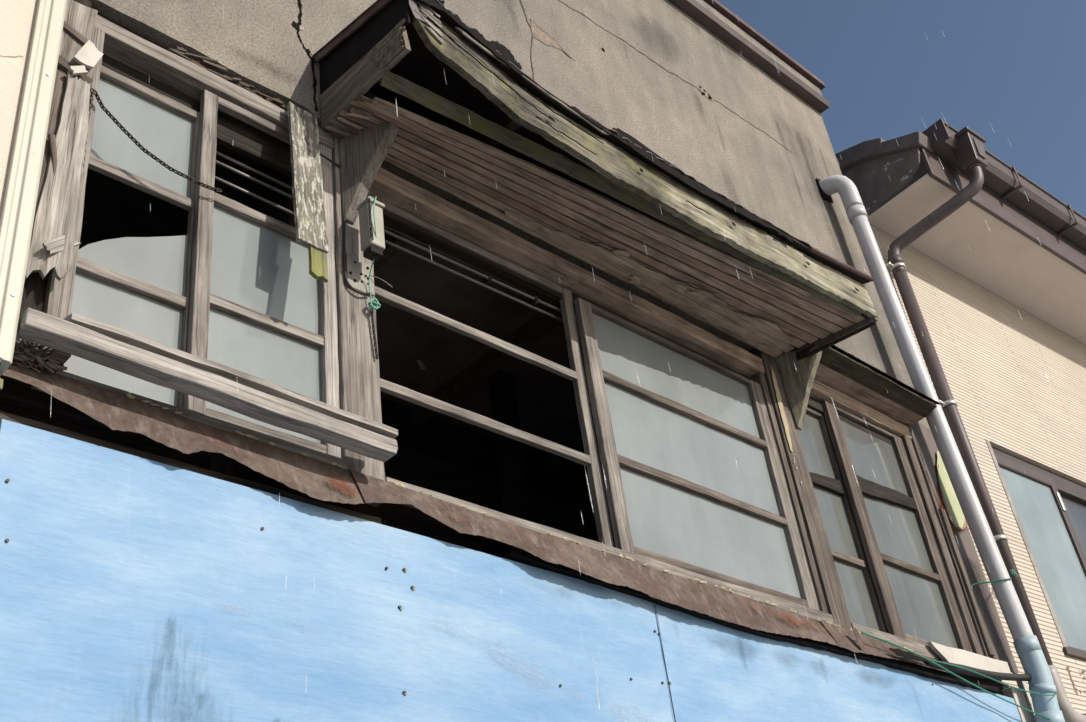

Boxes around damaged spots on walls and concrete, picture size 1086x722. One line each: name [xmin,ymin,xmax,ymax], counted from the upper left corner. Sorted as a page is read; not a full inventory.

crack [292,0,319,111]
crack [520,0,575,81]
crack [559,0,790,151]